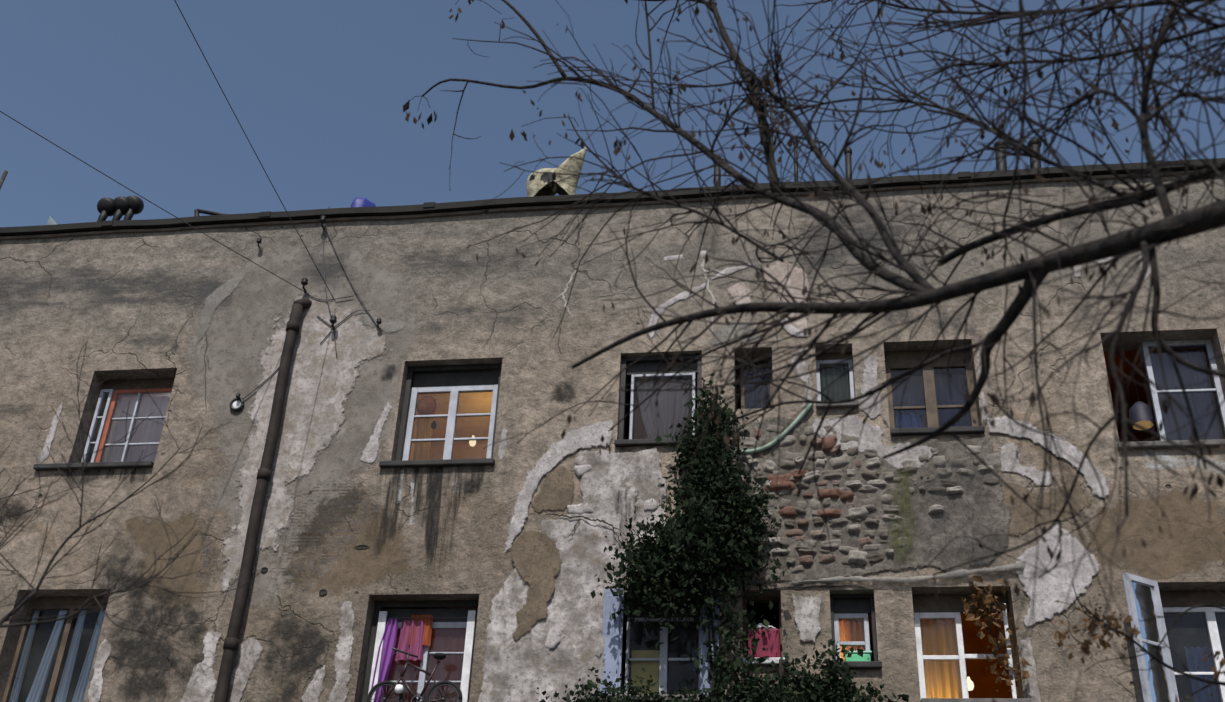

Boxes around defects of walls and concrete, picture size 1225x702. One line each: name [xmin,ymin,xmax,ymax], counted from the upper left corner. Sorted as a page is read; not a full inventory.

flaking render [195,275,245,345]
flaking render [219,291,403,593]
water stain [377,466,484,564]
flaking render [478,420,668,702]
flaking render [770,348,1109,702]